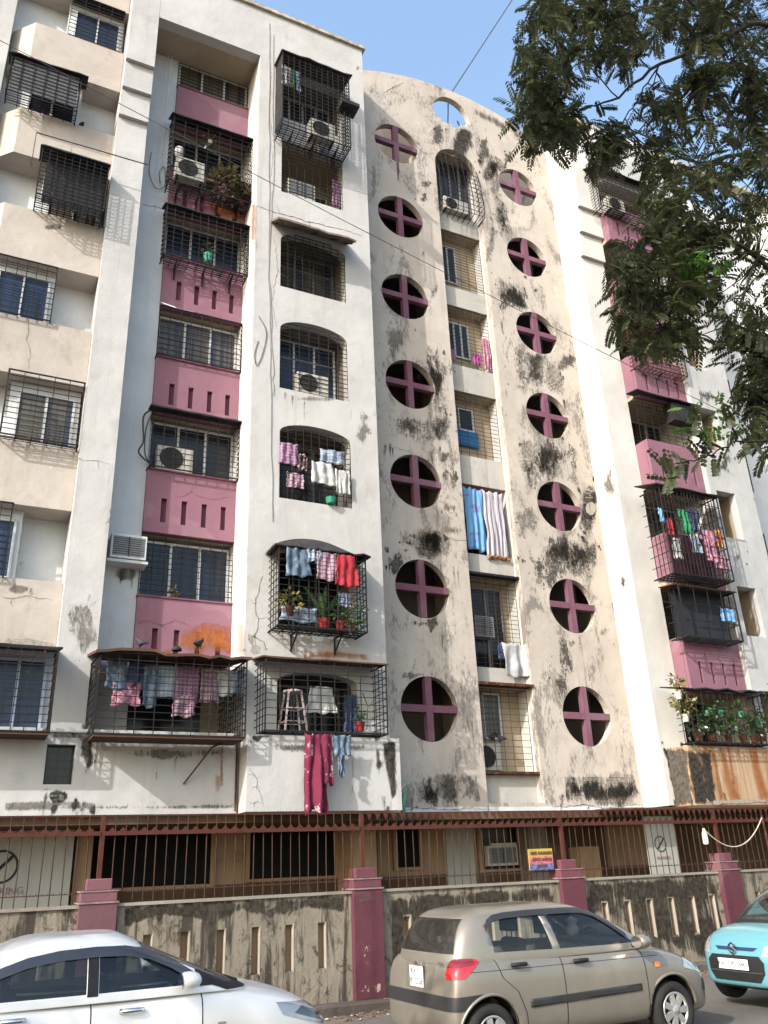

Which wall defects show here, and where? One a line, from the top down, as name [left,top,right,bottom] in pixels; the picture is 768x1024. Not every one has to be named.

damp [428,121,536,315]
damp [508,342,577,407]
damp [516,432,614,589]
damp [384,526,461,575]
corrosion [182,625,241,652]
damp [42,723,95,772]
damp [5,790,127,815]
damp [559,771,638,809]
corrosion [712,748,739,801]
corrosion [752,752,768,797]
damp [125,900,263,926]
damp [591,875,722,959]